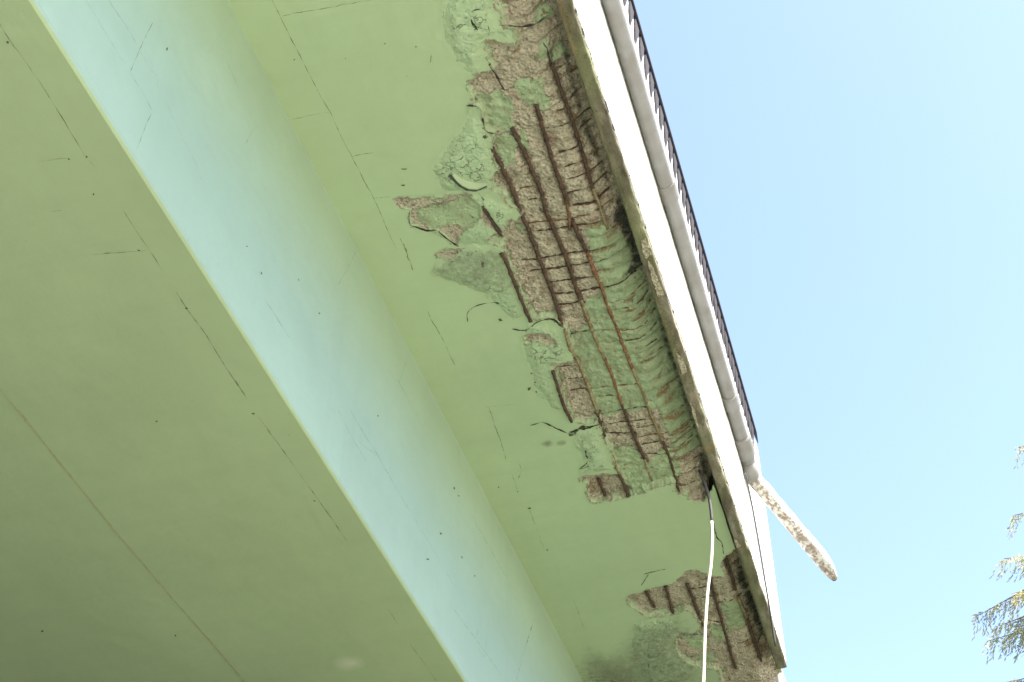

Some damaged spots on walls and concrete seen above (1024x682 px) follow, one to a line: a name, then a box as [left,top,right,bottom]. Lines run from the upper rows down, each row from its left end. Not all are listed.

crack [181,300,245,395]
crack [273,1,457,261]
spalling [393,0,712,505]
spalling [626,539,782,682]